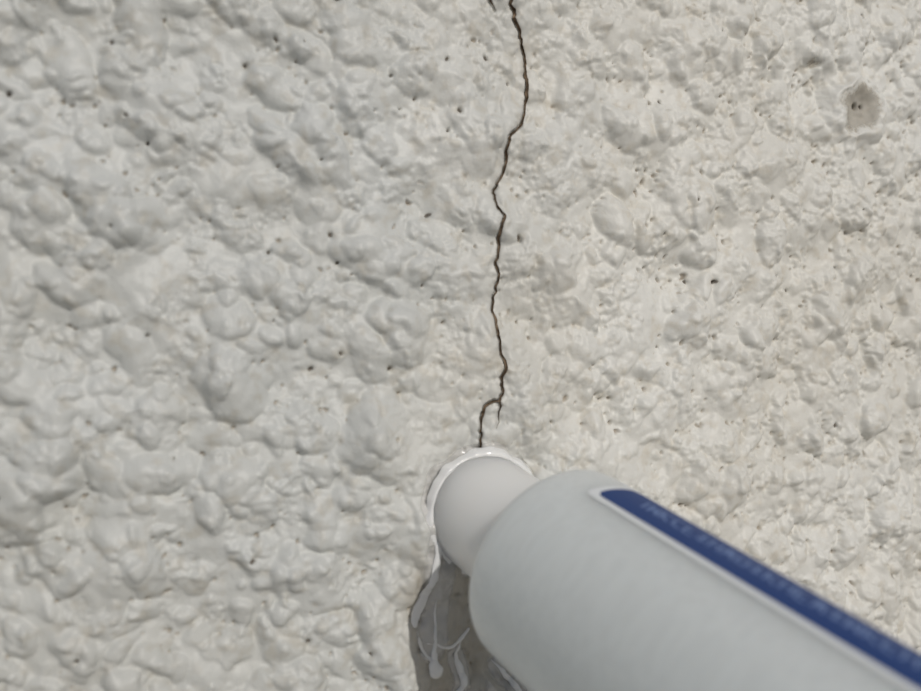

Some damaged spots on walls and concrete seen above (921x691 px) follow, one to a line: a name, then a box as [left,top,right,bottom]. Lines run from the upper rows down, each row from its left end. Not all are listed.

crack [479,0,529,448]